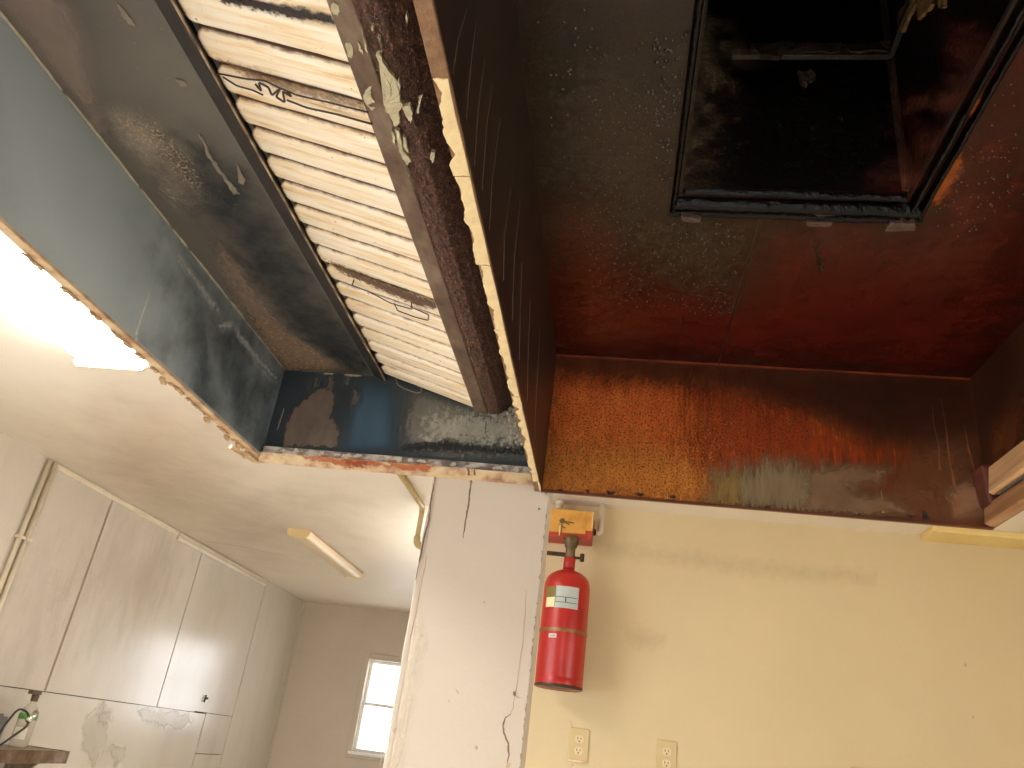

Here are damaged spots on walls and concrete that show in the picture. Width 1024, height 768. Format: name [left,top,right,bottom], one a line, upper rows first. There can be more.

peeling [345,22,423,165]
peeling [0,11,283,367]
peeling [433,78,547,494]
peeling [58,286,259,464]
peeling [277,373,362,458]
corrosion [299,453,434,472]
crack [463,480,474,535]
corrosion [544,368,980,520]
peeling [81,702,125,767]
crack [502,593,527,768]